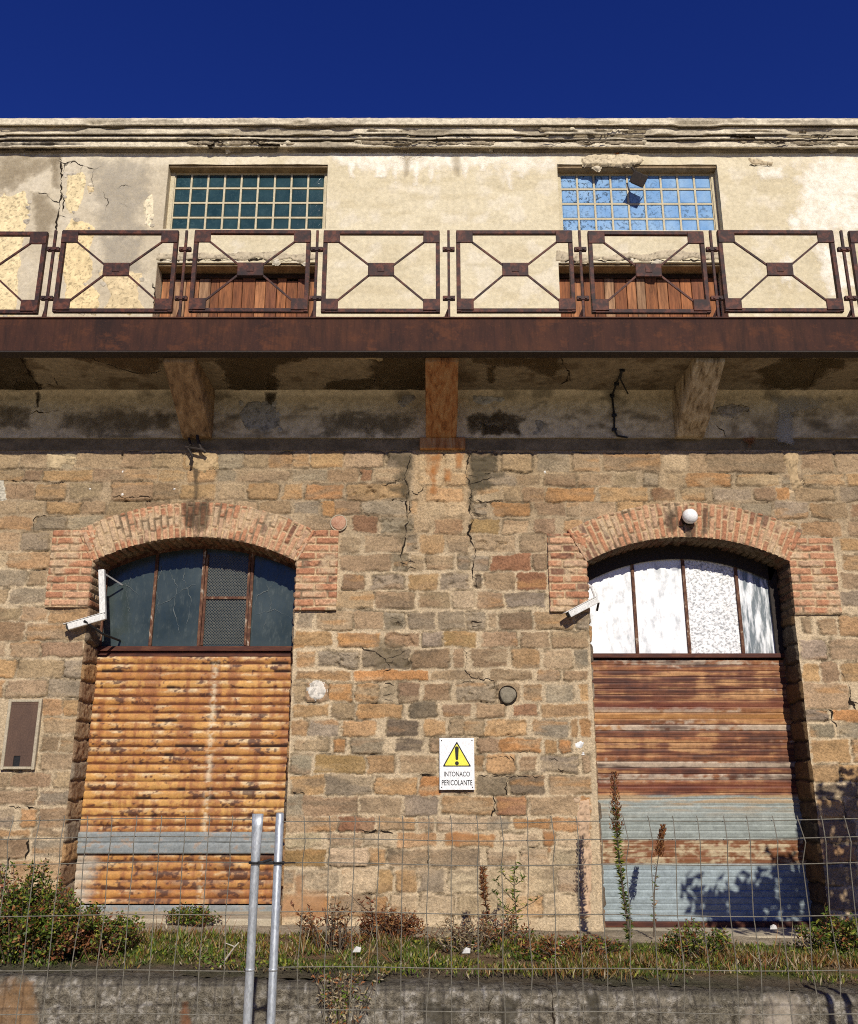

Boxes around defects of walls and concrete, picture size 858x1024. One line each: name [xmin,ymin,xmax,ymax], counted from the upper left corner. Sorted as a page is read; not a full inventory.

spalling [187,136,295,154]
spalling [538,127,647,172]
spalling [728,130,858,166]
crack [39,159,131,230]
peeling [0,191,33,317]
peeling [58,170,145,316]
water stain [0,358,42,427]
water stain [64,411,166,432]
water stain [469,411,524,435]
water stain [758,358,844,444]
crack [381,454,423,560]
crack [465,453,499,589]